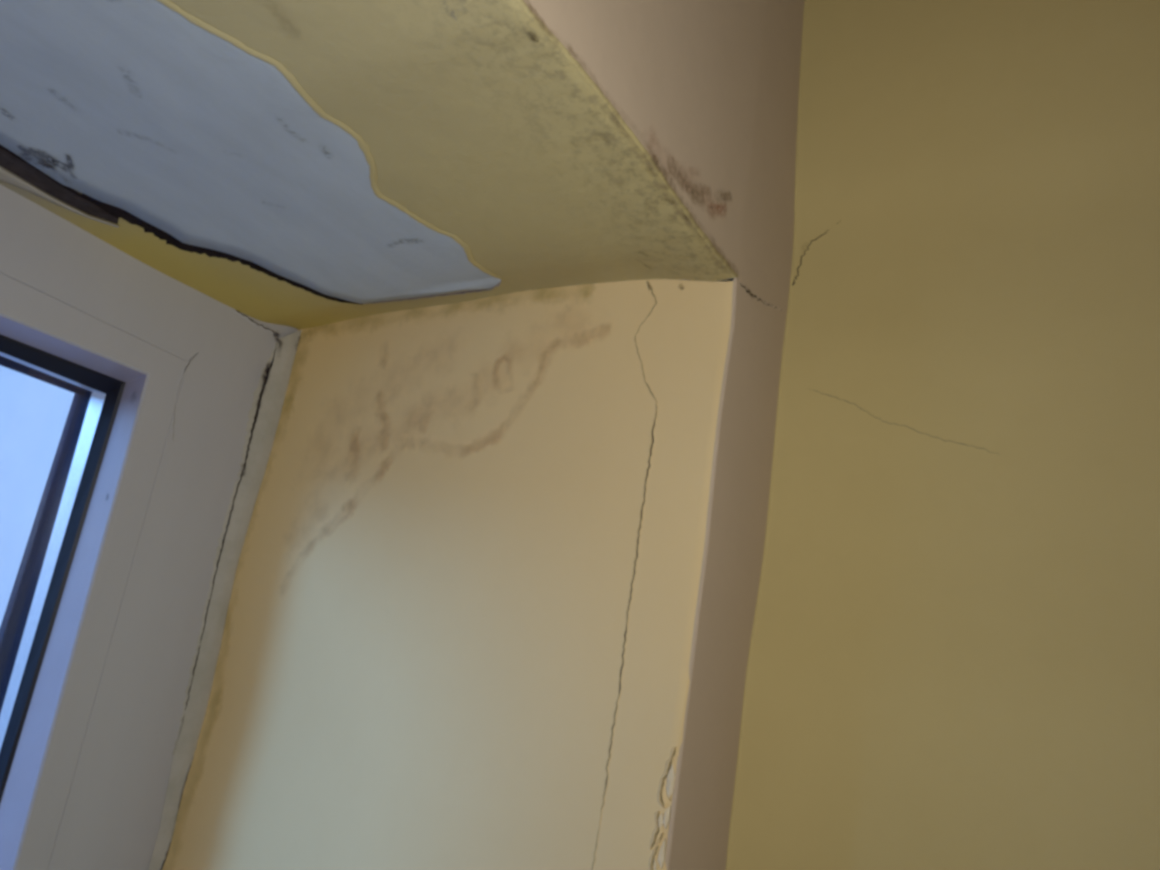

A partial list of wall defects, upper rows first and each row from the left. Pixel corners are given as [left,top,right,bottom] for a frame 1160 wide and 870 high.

peeling [0,0,503,304]
crack [591,283,659,870]
spalling [648,747,679,870]